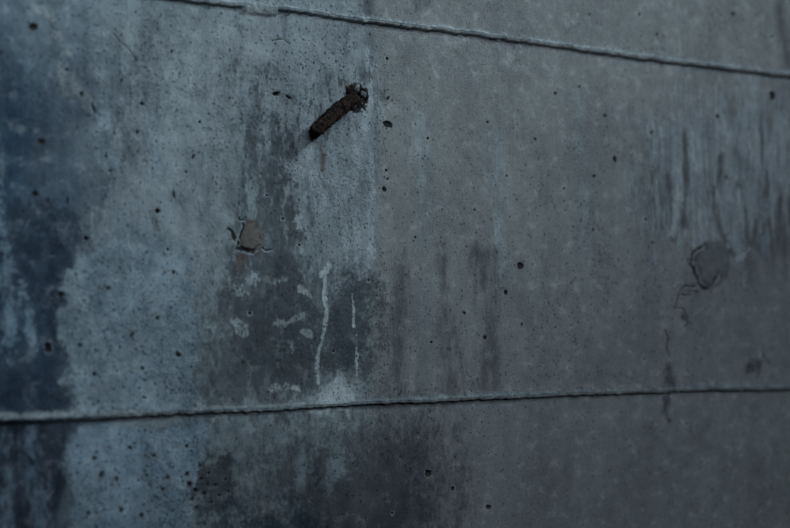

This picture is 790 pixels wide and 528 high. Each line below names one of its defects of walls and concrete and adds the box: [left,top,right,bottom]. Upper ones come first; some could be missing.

leakage [267,0,790,73]
corrosion [308,86,369,139]
flaking render [227,217,272,255]
leakage [88,12,790,419]
leakage [0,146,87,528]
leakage [215,413,440,528]